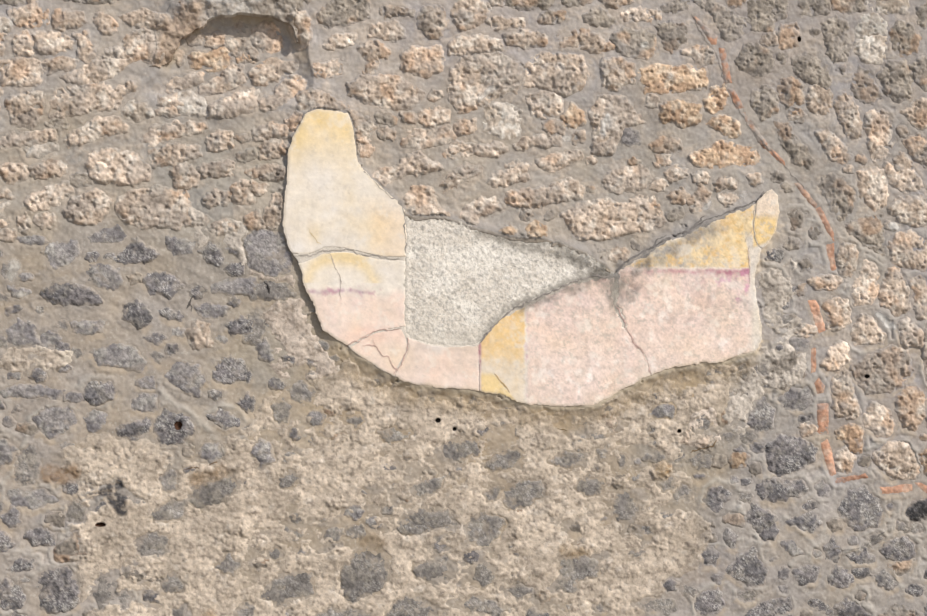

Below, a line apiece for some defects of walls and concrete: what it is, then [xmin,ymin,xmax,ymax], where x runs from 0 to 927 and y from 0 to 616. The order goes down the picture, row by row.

peeling [188,207,209,249]
crack [296,164,407,297]
crack [480,191,764,343]
crack [341,329,409,373]
crack [616,307,651,374]
flaking render [59,221,807,616]